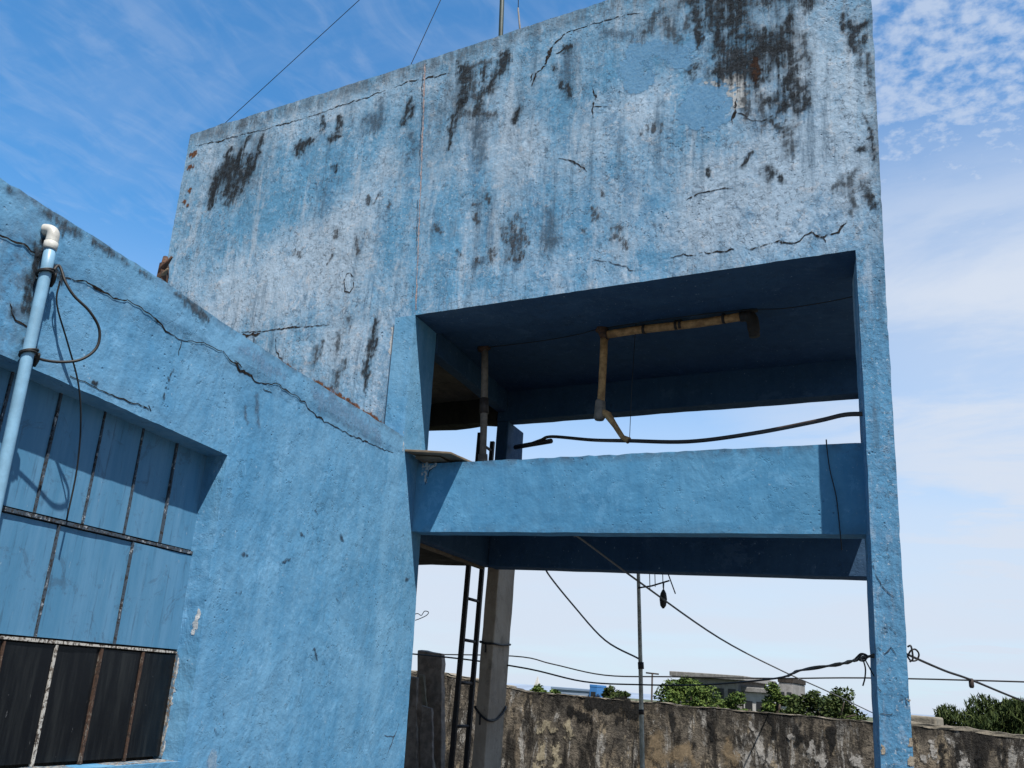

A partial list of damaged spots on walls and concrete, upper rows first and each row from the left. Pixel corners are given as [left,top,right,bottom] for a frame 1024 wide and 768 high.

leakage [447,48,513,164]
crack [530,13,639,85]
leakage [603,0,816,157]
leakage [207,133,264,211]
crack [195,73,446,253]
leakage [831,169,879,214]
leakage [473,206,557,269]
crack [671,223,846,258]
crack [65,277,393,453]
leakage [361,318,379,389]
corrosion [314,380,385,424]
peeling [191,608,201,635]